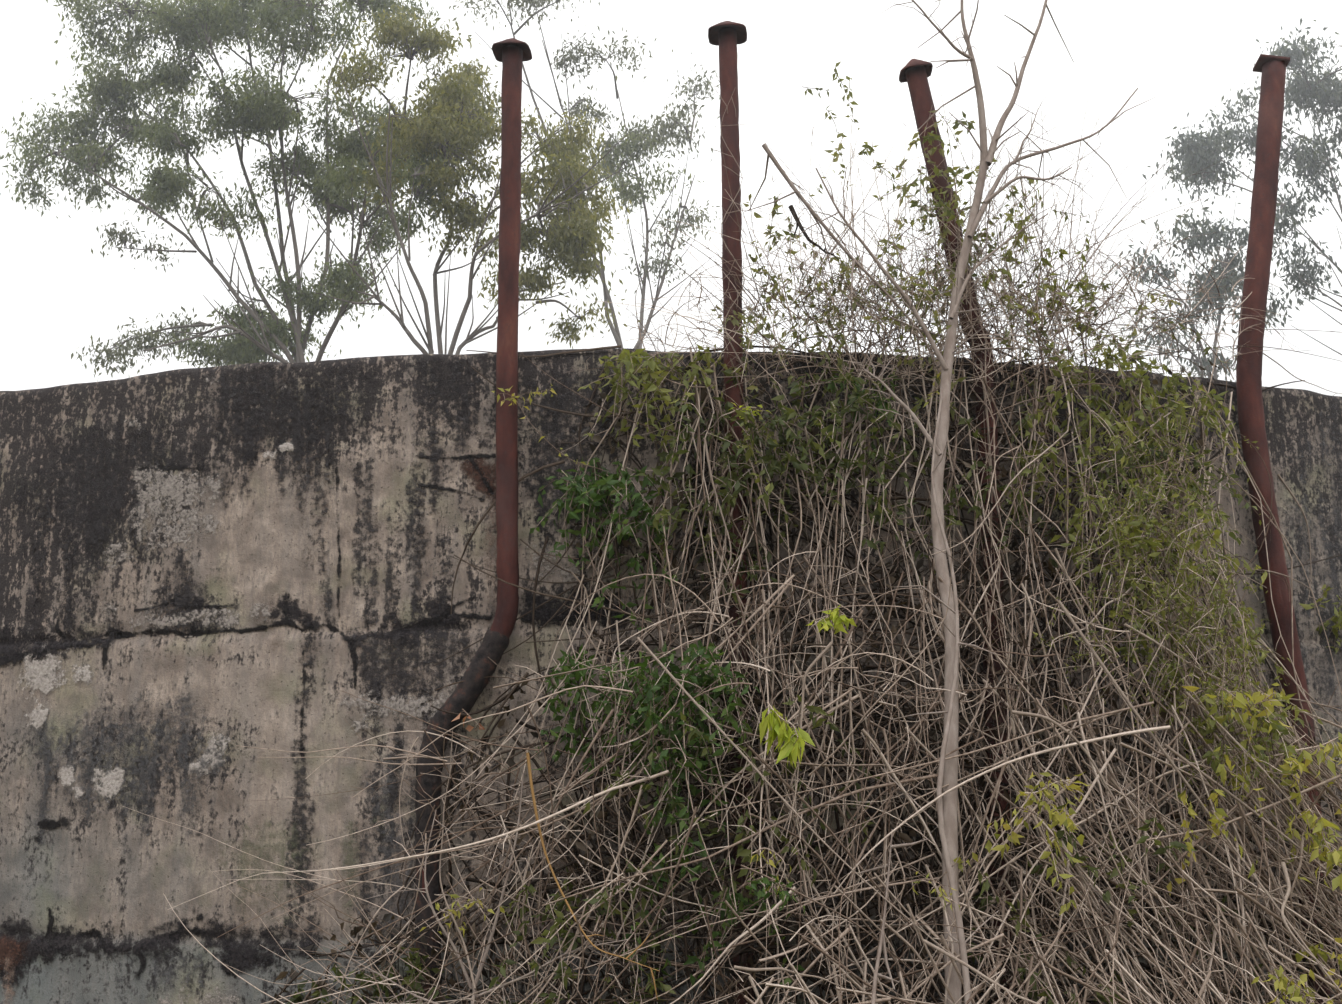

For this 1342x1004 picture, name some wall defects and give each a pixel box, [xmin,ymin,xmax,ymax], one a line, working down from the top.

leakage [13,363,376,950]
crack [0,467,638,756]
leakage [343,356,494,953]
leakage [1274,396,1342,767]